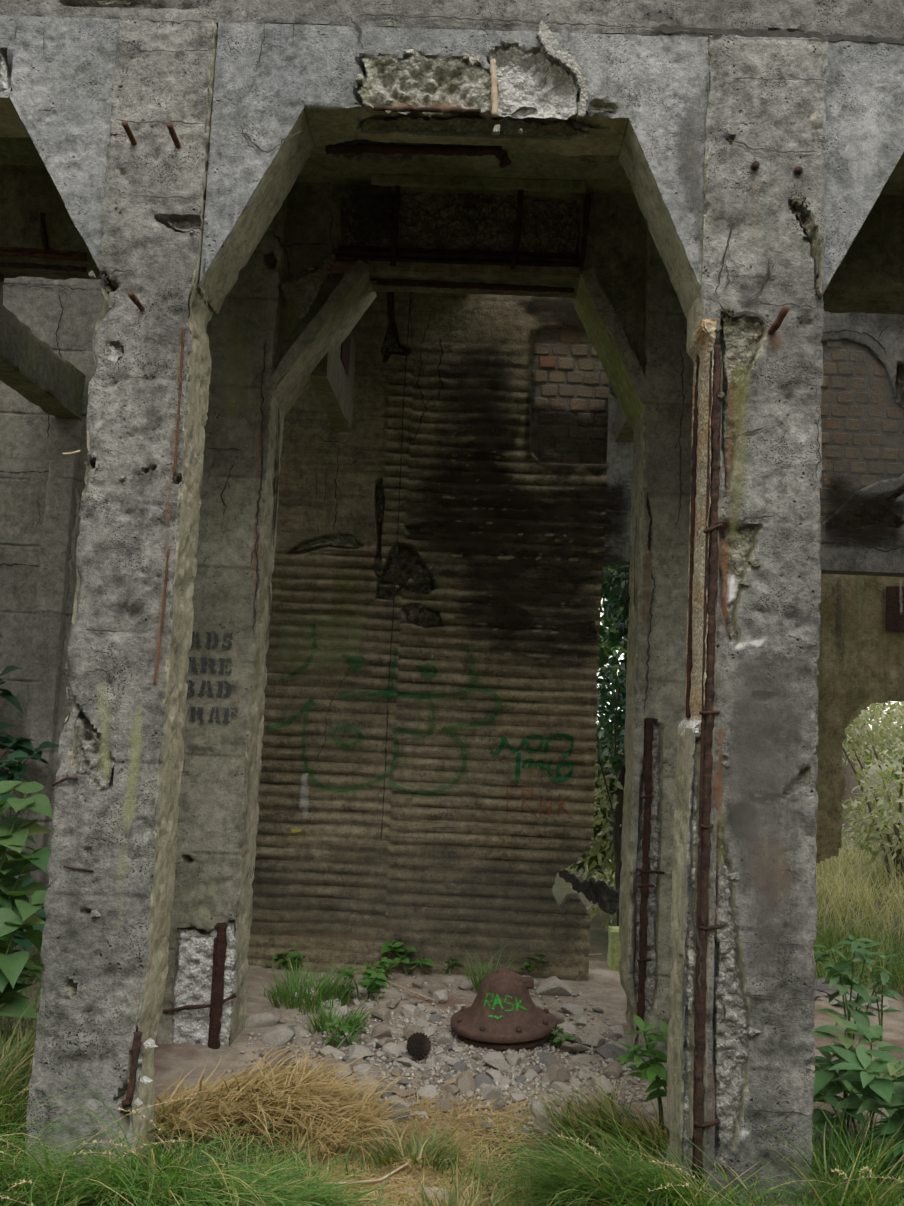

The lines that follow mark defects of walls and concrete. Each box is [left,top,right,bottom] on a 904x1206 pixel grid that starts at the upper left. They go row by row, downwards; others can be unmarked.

spalling [355,20,614,136]
spalling [788,197,824,299]
damp [473,360,628,529]
flaking render [531,328,609,464]
flaking render [819,340,904,528]
spalling [403,604,440,626]
spalling [172,923,237,1046]
spalling [124,1038,159,1107]